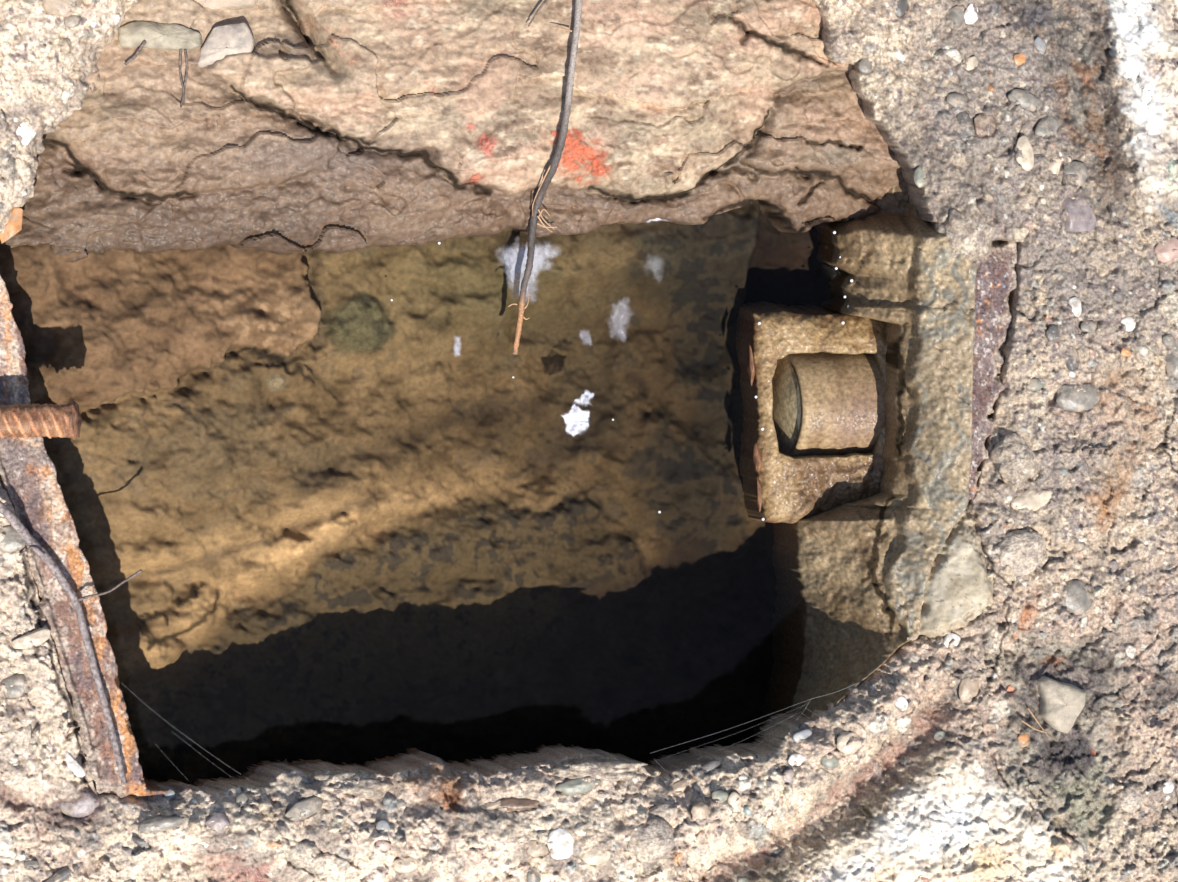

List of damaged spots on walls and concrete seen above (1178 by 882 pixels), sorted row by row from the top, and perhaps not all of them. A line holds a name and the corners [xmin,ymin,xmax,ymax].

spalling [198,22,255,68]
crack [285,0,308,42]
crack [729,17,823,64]
crack [231,86,489,192]
crack [42,139,193,202]
crack [588,111,877,232]
peeling [563,391,594,436]